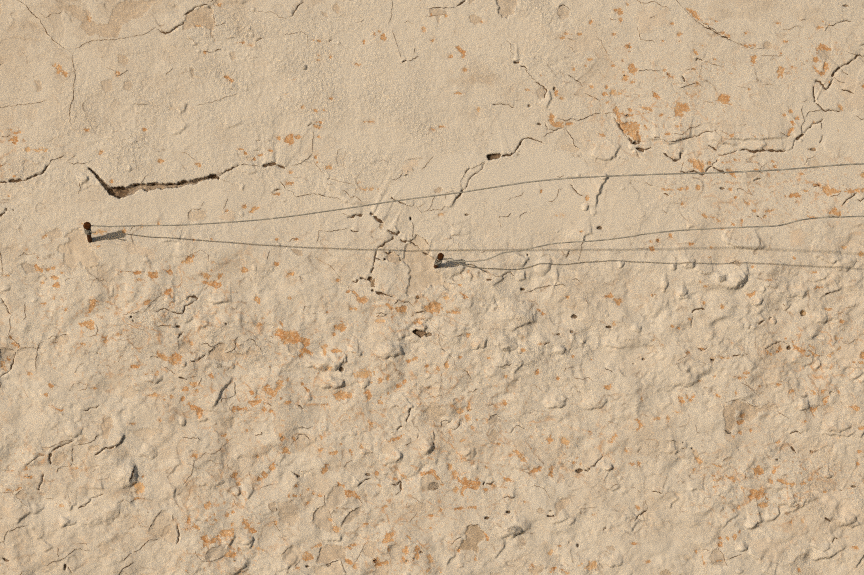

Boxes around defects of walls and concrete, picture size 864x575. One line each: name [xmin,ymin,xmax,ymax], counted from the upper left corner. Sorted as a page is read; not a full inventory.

crack [21,0,233,116]
crack [637,0,801,61]
peeling [832,72,864,114]
crack [0,156,90,193]
spalling [88,168,220,199]
peeling [388,126,597,214]
peeling [45,228,101,269]
peeling [400,234,452,297]
crack [220,44,864,429]
crack [0,300,66,385]
crack [124,290,273,385]
peeling [459,517,489,553]